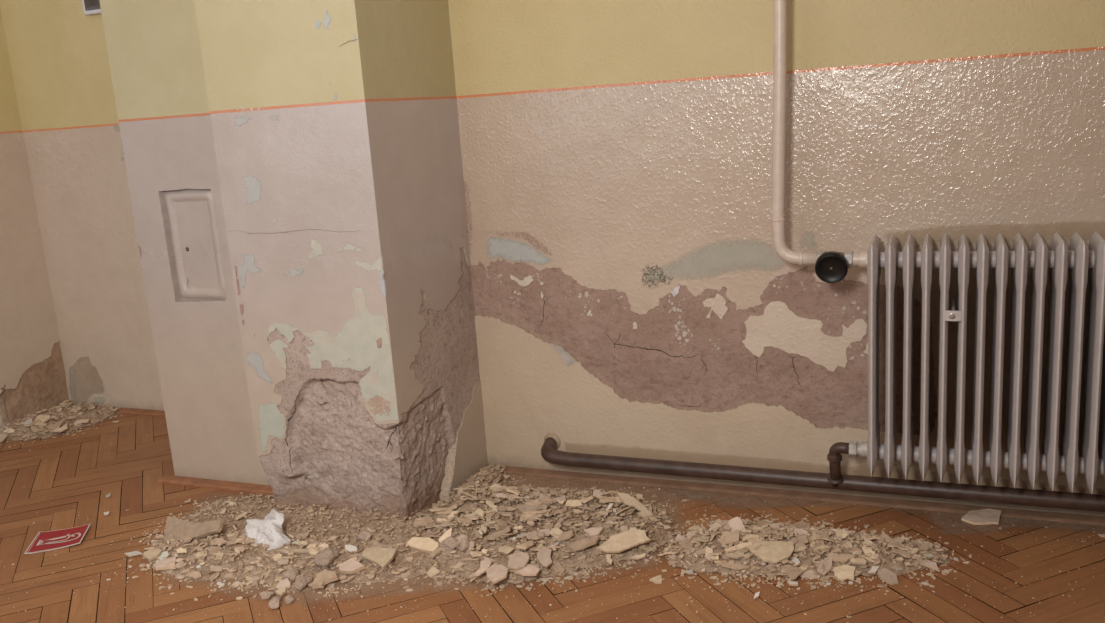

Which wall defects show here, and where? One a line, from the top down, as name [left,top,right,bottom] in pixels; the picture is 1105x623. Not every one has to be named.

spalling [0,342,104,424]
spalling [247,247,937,521]
crack [606,333,707,373]